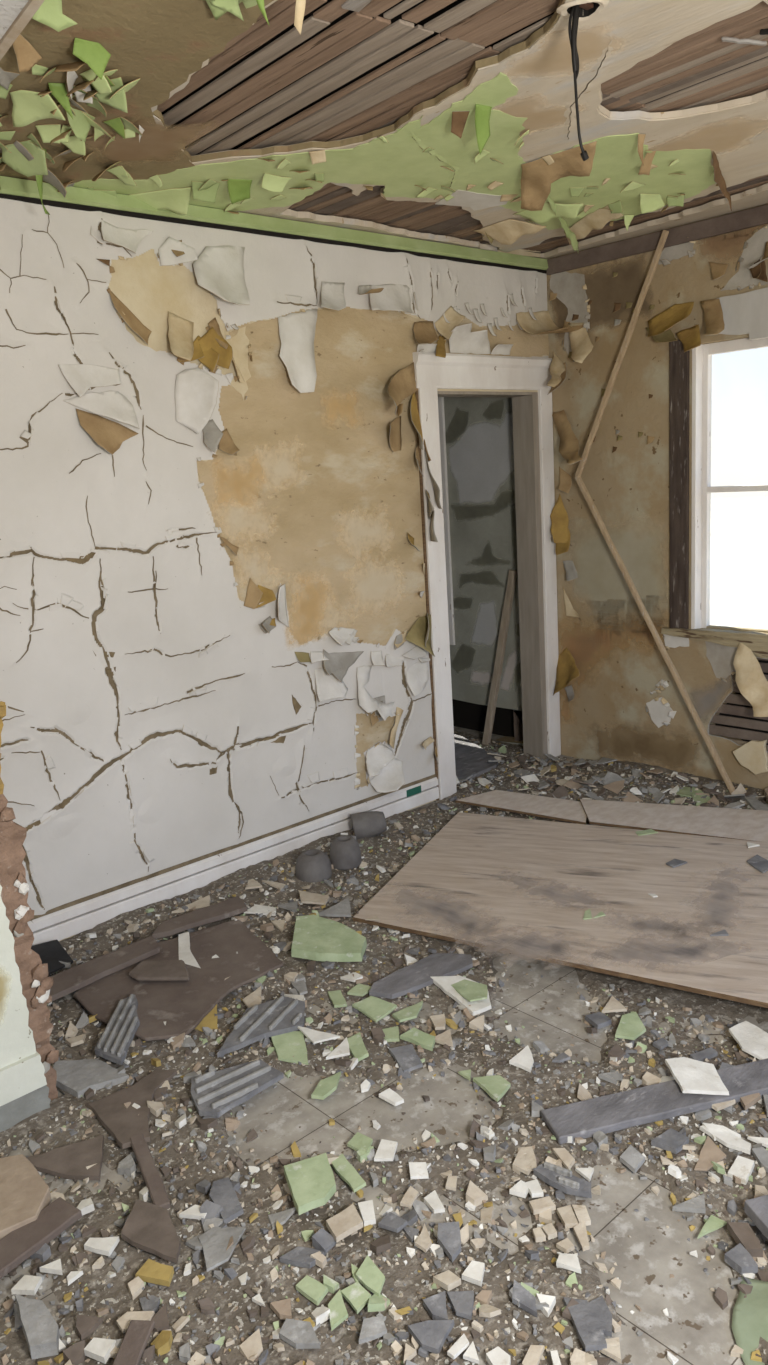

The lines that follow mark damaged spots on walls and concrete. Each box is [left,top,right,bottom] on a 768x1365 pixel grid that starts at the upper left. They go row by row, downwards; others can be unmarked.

flaking render [0,0,768,258]
crack [403,260,459,318]
peeling [58,364,140,455]
flaking render [97,220,655,793]
spalling [63,548,98,564]
crack [0,214,355,910]
spalling [92,630,116,677]
crack [394,661,432,756]
flaking render [707,669,768,753]
flaking render [756,657,768,681]